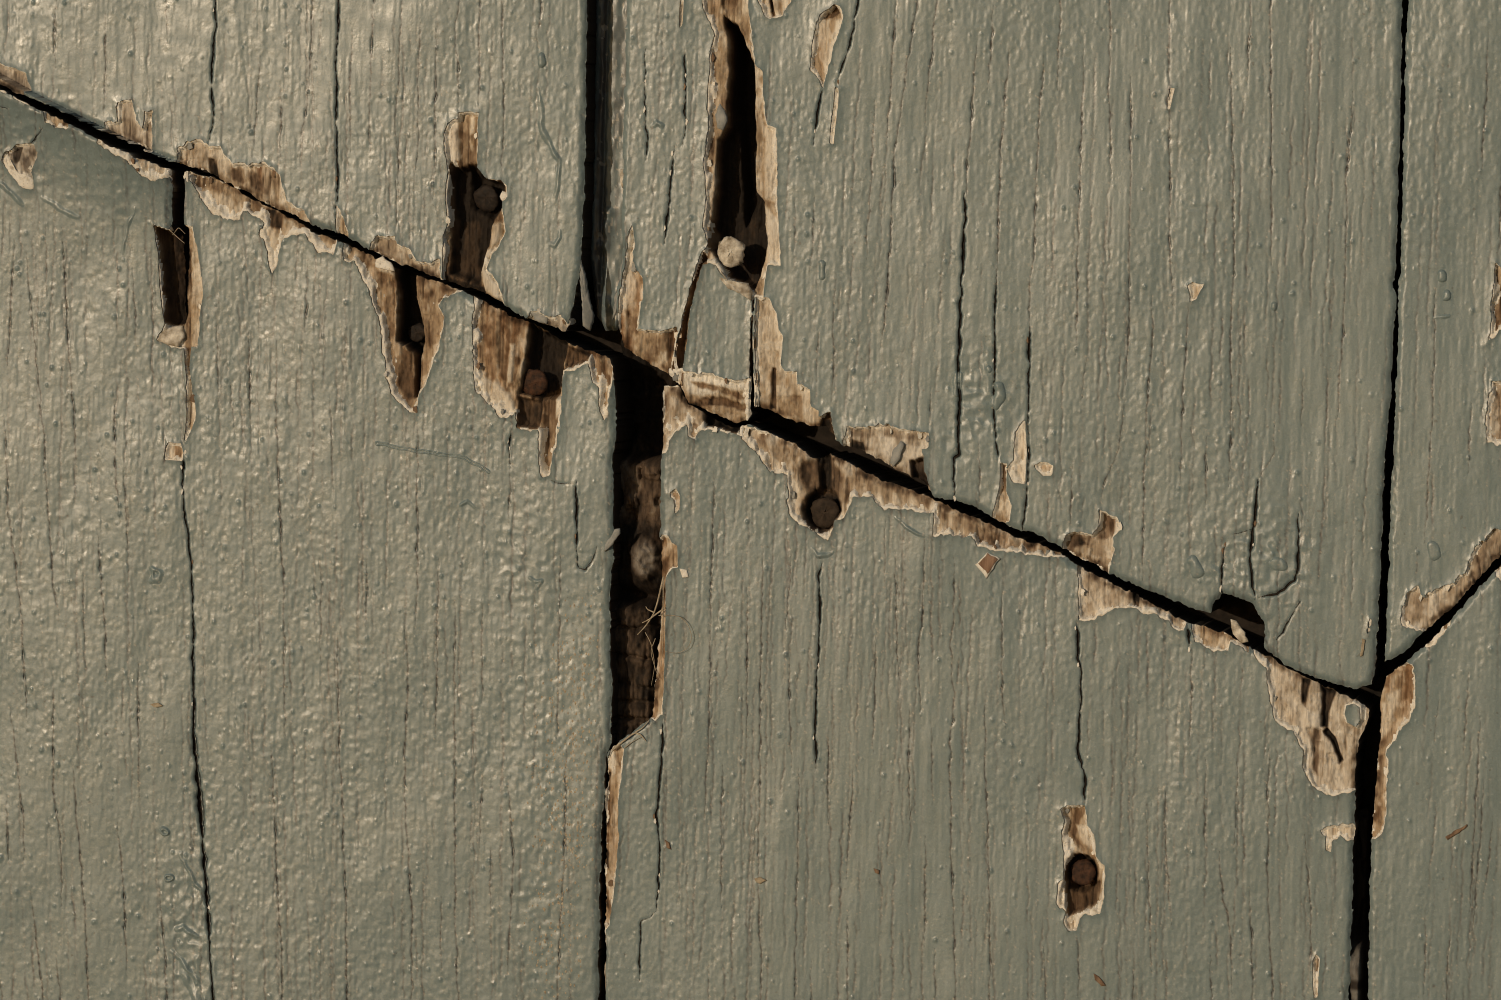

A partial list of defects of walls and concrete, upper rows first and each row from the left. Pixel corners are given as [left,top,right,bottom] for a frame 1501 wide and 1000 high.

crack [254,0,505,223]
peeling [758,0,791,19]
peeling [810,4,843,144]
peeling [0,63,1416,852]
crack [929,0,1353,640]
peeling [1485,381,1501,446]
crack [180,450,214,1000]
peeling [604,743,624,991]
crack [638,724,664,981]
crack [704,491,1005,1000]
crack [1074,623,1086,799]
peeling [1400,528,1501,647]